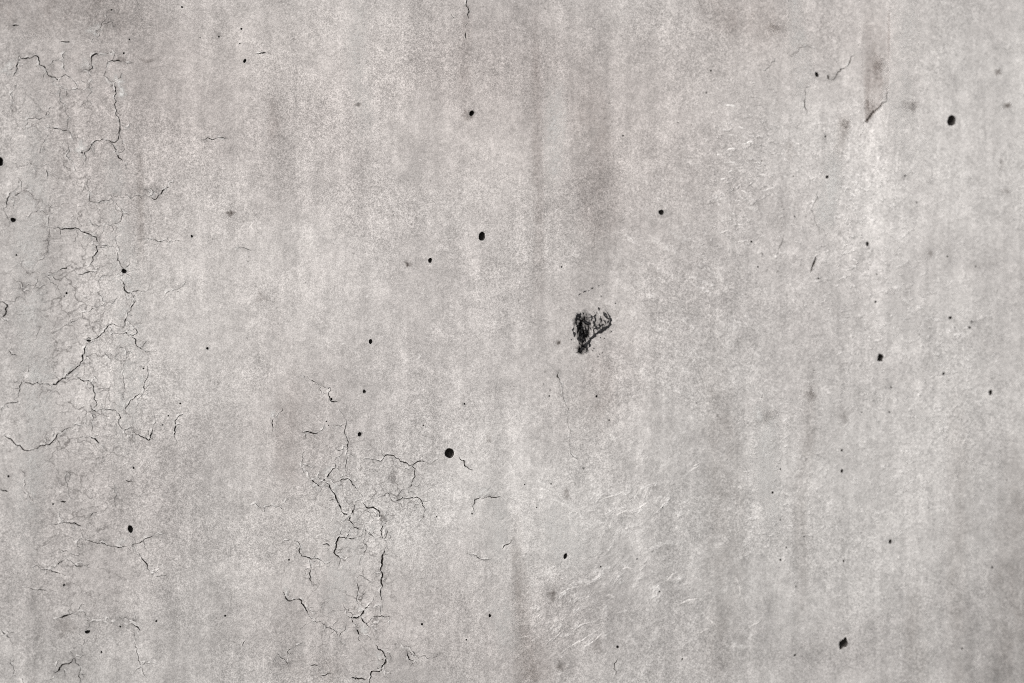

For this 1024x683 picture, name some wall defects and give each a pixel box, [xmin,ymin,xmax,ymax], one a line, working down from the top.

crack [0,11,185,500]
crack [0,472,166,683]
crack [249,499,287,512]
crack [273,375,501,683]